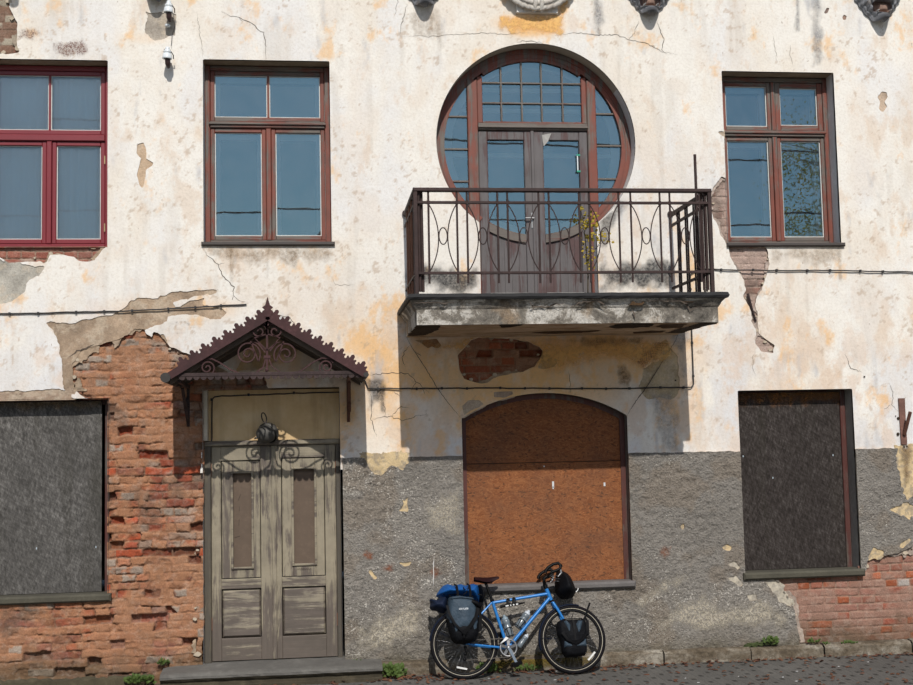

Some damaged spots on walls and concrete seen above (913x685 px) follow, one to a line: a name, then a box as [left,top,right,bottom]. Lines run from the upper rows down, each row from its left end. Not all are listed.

spalling [0,0,19,54]
water stain [500,1,568,35]
flaking render [137,143,153,187]
spalling [0,246,107,304]
spalling [711,177,774,353]
crack [370,344,456,432]
spalling [408,325,441,348]
spalling [458,323,717,399]
spalling [0,289,297,685]
peeling [359,450,410,476]
peeling [890,444,913,519]
spalling [766,538,913,644]